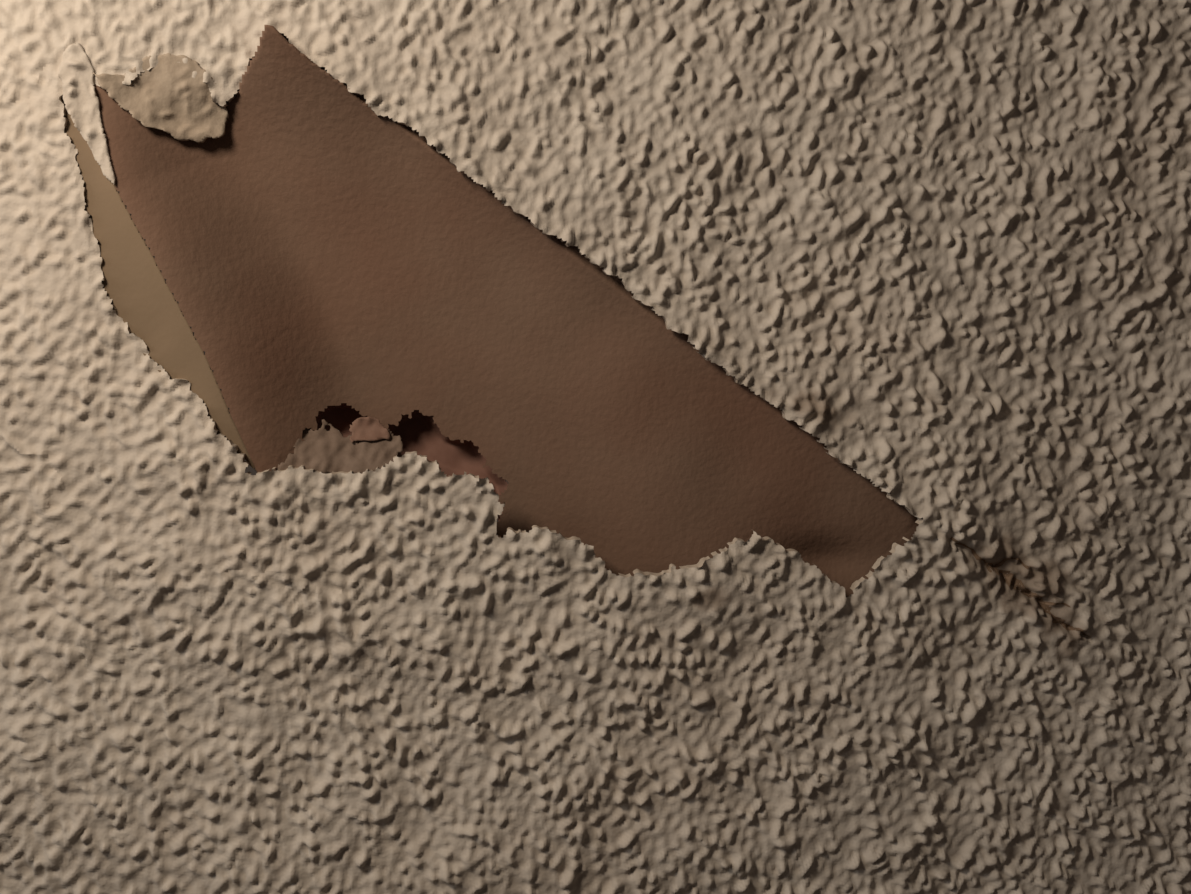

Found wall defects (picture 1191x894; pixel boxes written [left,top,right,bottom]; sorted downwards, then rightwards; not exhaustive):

peeling [58,25,923,597]
crack [950,537,1090,637]